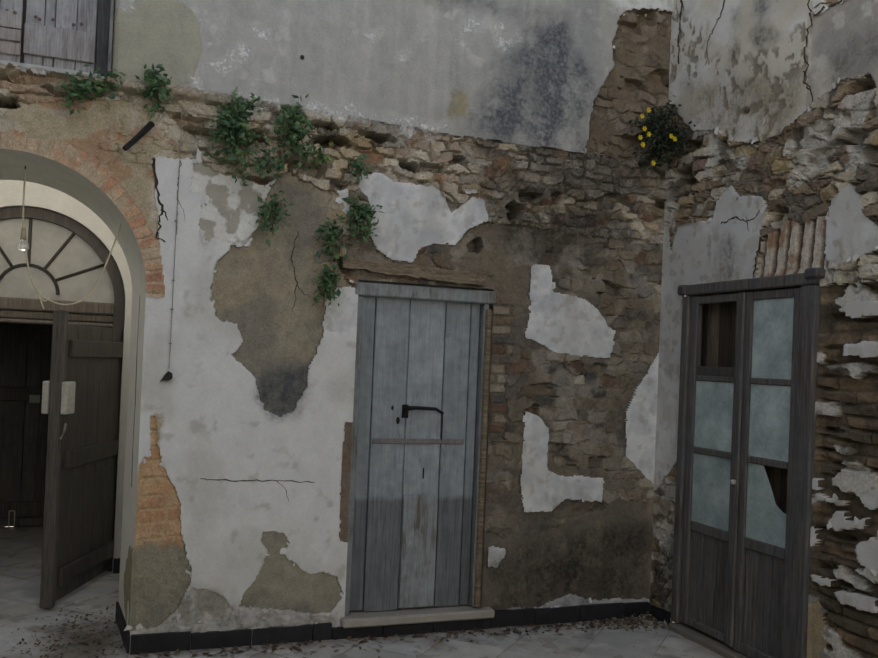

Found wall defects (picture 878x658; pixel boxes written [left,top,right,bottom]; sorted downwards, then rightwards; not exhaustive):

crack [676,0,684,64]
crack [803,0,842,103]
peeling [810,0,844,14]
flaking render [0,8,878,417]
crack [721,210,761,278]
spalling [124,416,344,631]
crack [200,478,314,501]
flaking render [328,212,677,612]
flaking render [807,246,878,658]